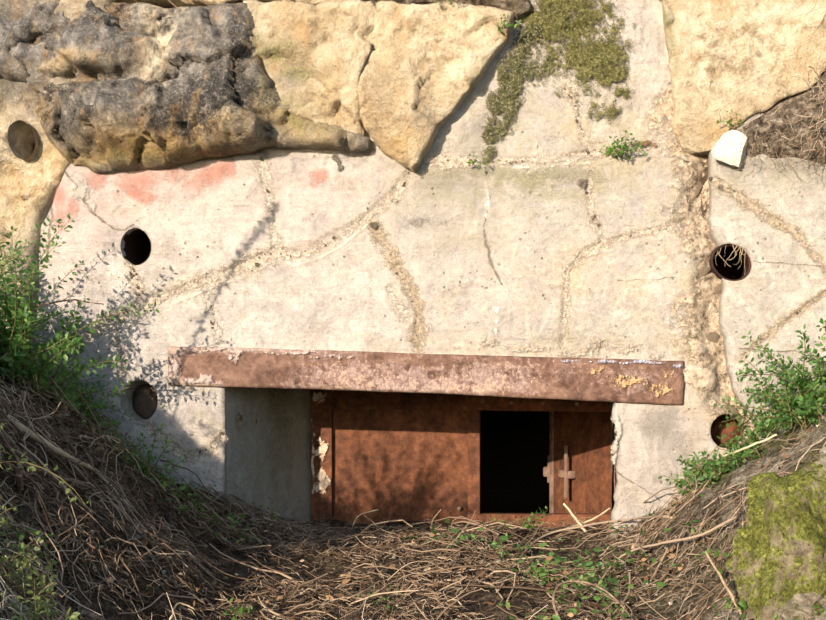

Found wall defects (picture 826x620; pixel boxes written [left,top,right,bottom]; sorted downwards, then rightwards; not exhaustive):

crack [64,171,134,230]
crack [78,78,826,440]
rust [589,365,676,398]
peeling [311,419,331,494]